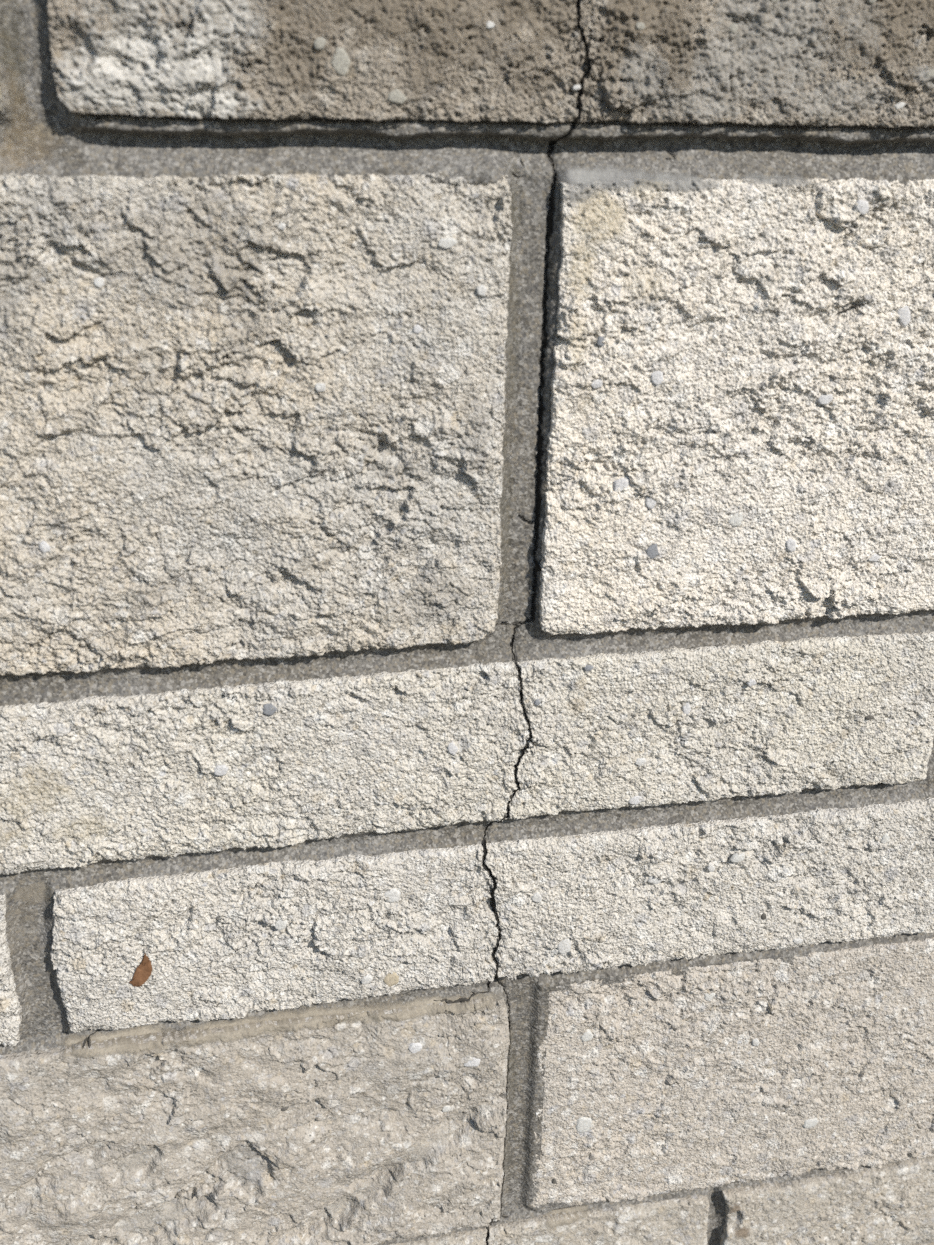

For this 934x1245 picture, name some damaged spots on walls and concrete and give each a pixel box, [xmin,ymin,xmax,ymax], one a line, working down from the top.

crack [434,0,932,1245]